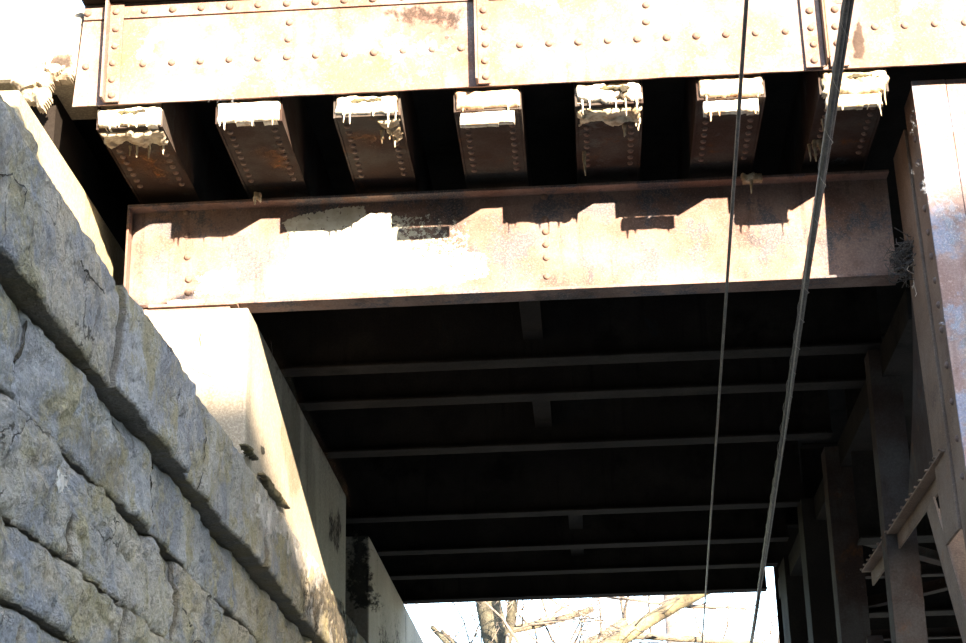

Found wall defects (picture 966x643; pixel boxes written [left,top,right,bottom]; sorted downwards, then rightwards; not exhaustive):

corrosion [386,6,461,38]
corrosion [853,22,865,58]
spalling [10,51,75,114]
leakage [335,95,403,148]
leakage [455,89,520,128]
leakage [576,81,642,137]
peeling [264,206,488,297]
leakage [255,493,402,643]